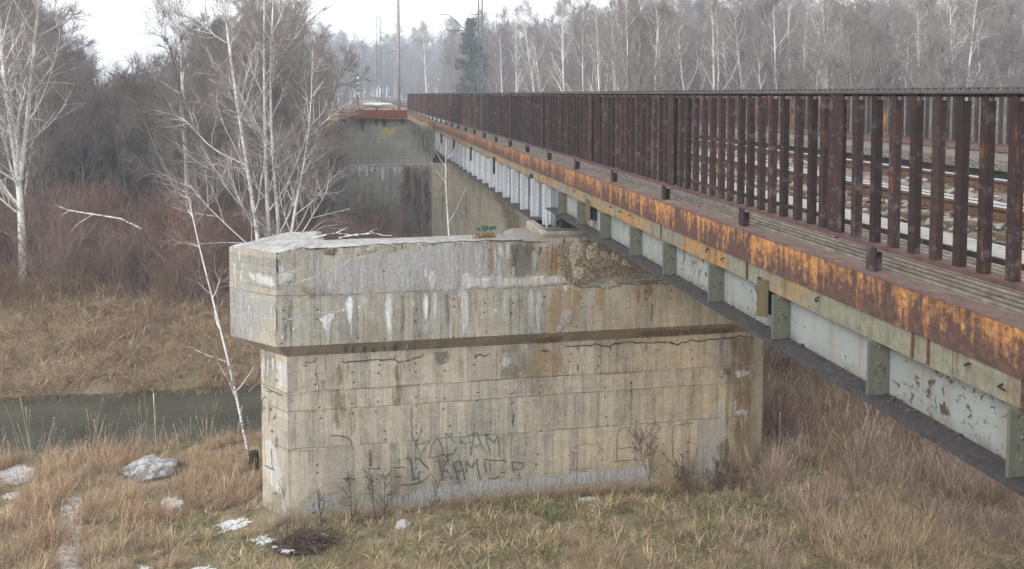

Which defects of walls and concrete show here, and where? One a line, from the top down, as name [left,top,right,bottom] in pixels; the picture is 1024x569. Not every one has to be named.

water stain [309,244,578,331]
spalling [557,239,644,289]
crack [302,303,422,411]
crack [530,280,751,432]